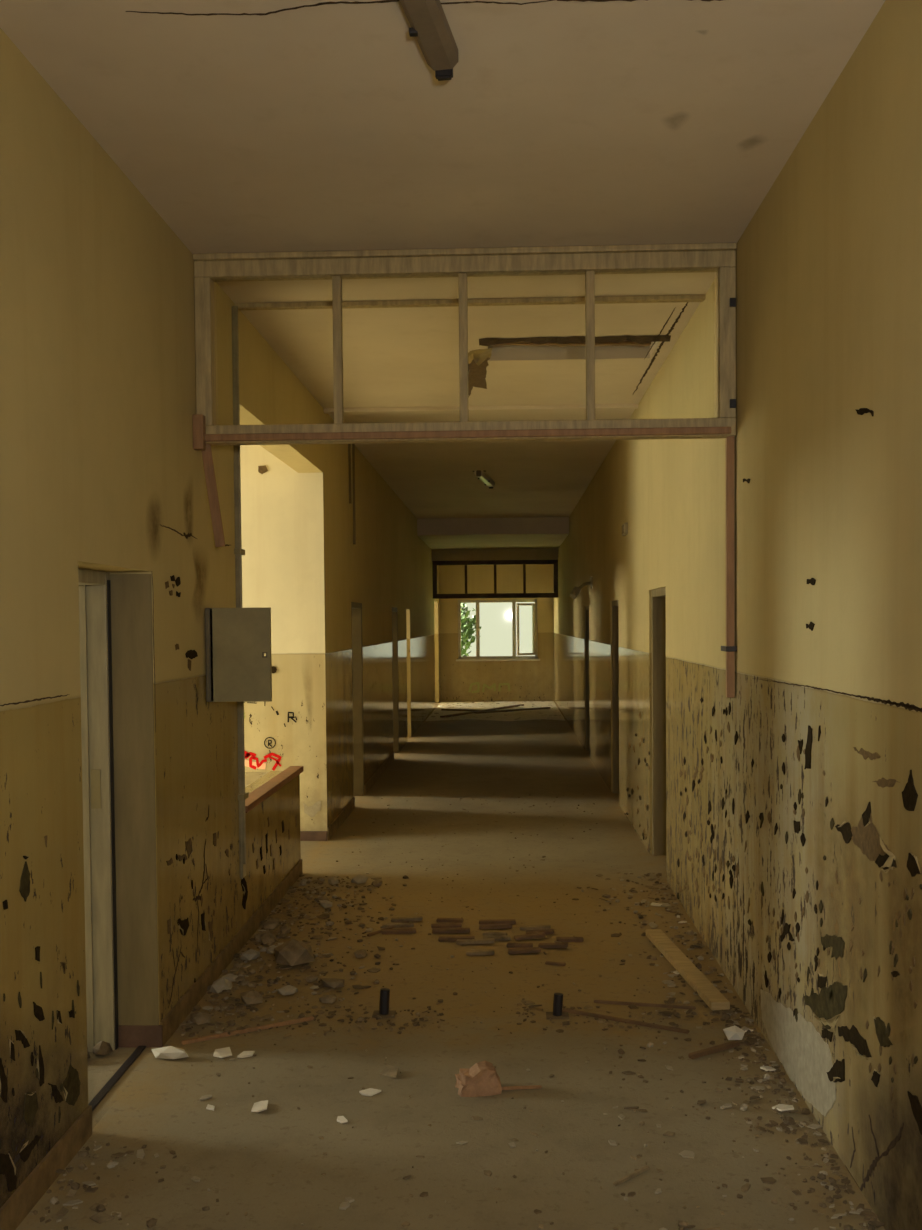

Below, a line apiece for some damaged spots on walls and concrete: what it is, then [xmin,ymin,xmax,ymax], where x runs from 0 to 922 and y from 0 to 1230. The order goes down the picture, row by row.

crack [126,0,399,16]
crack [440,0,635,8]
peeling [468,348,492,398]
crack [0,694,70,706]
crack [752,678,922,712]
peeling [780,725,825,789]
peeling [677,698,806,909]
peeling [872,770,918,811]
peeling [19,856,30,902]
flaking render [748,797,922,1135]
peeling [3,962,80,1030]
peeling [0,1029,80,1192]